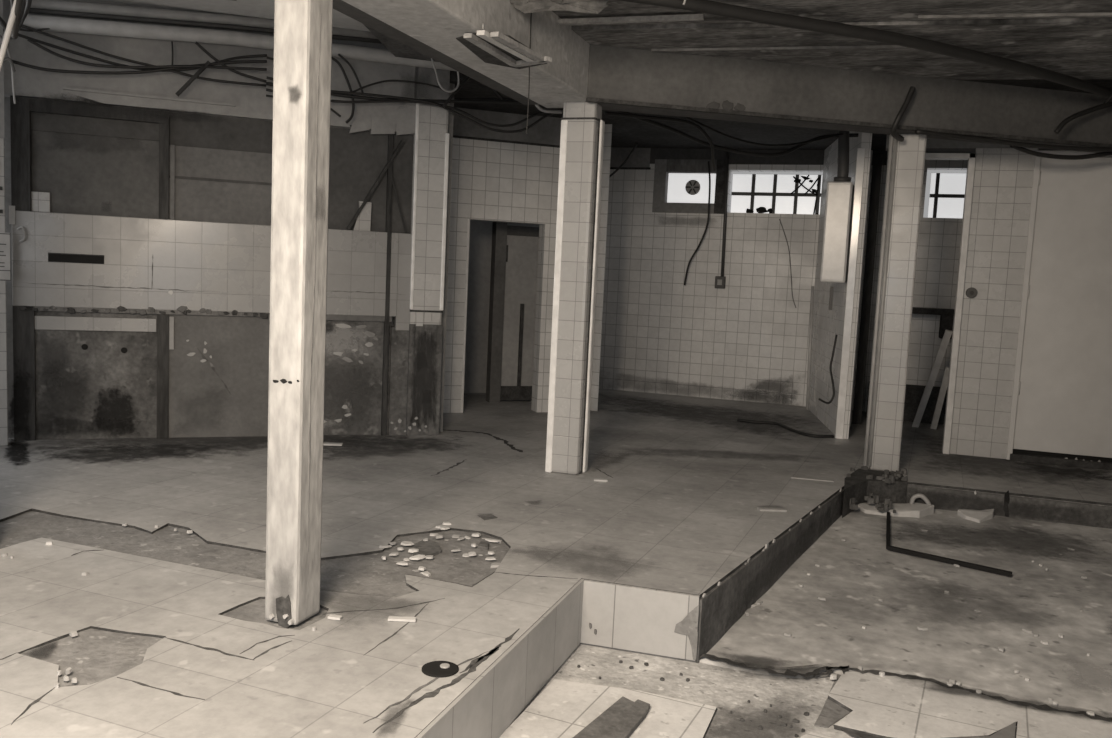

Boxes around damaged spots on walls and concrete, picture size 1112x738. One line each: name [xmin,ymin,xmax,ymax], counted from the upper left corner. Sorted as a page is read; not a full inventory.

spalling [509,0,609,14]
damp [5,346,268,465]
damp [615,381,801,435]
spalling [839,466,908,518]
peeling [0,511,266,580]
peeling [320,514,510,597]
peeling [223,595,328,630]
crack [11,687,55,725]
peeling [21,628,163,687]
crack [117,677,205,700]
crack [163,635,294,660]
crack [364,629,519,733]